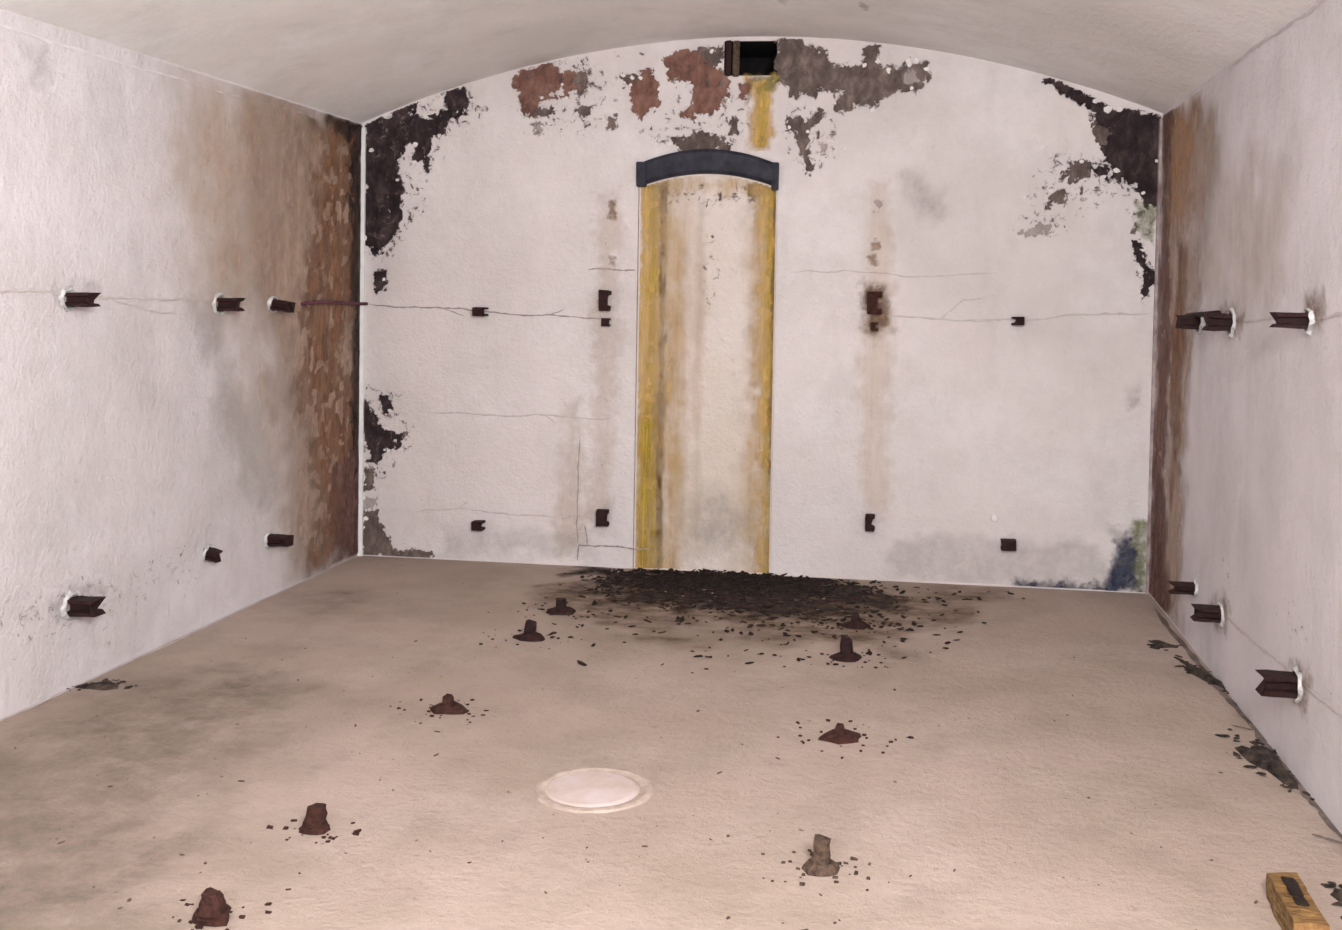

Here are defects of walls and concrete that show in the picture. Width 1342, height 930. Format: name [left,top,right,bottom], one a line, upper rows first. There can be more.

peeling [365,86,489,294]
peeling [511,44,763,152]
peeling [773,38,932,177]
peeling [1018,78,1161,302]
rust [865,287,888,334]
peeling [363,376,435,558]